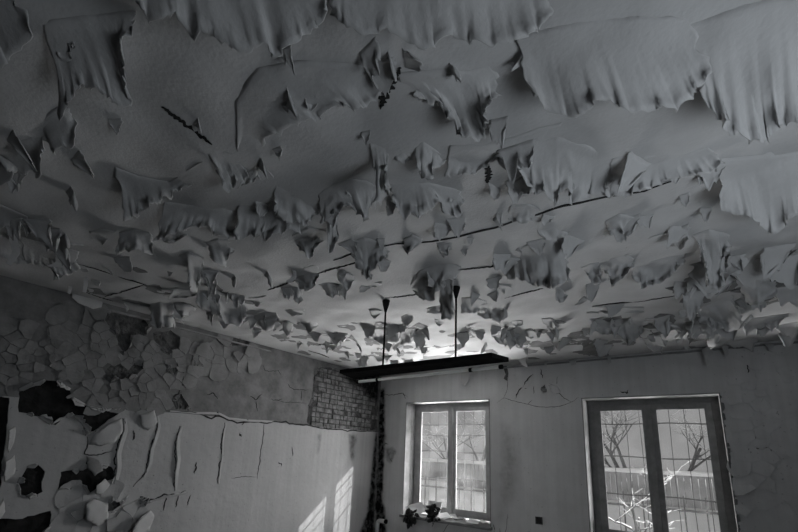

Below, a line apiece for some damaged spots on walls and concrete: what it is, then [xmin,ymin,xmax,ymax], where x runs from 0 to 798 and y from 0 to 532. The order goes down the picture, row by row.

peeling [0,0,33,69]
crack [506,370,577,407]
crack [84,365,392,510]